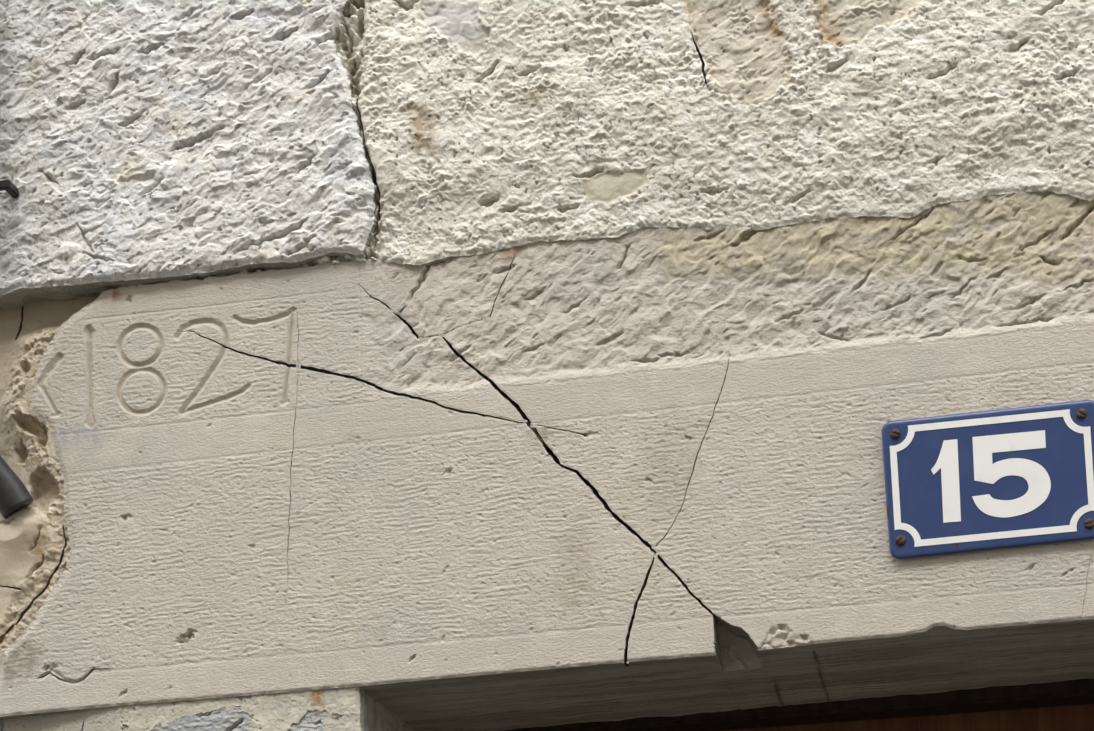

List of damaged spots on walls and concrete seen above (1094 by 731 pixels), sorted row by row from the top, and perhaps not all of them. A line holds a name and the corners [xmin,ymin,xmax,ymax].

spalling [0,303,90,651]
crack [179,257,731,667]
peeling [3,689,128,731]
peeling [717,623,828,710]